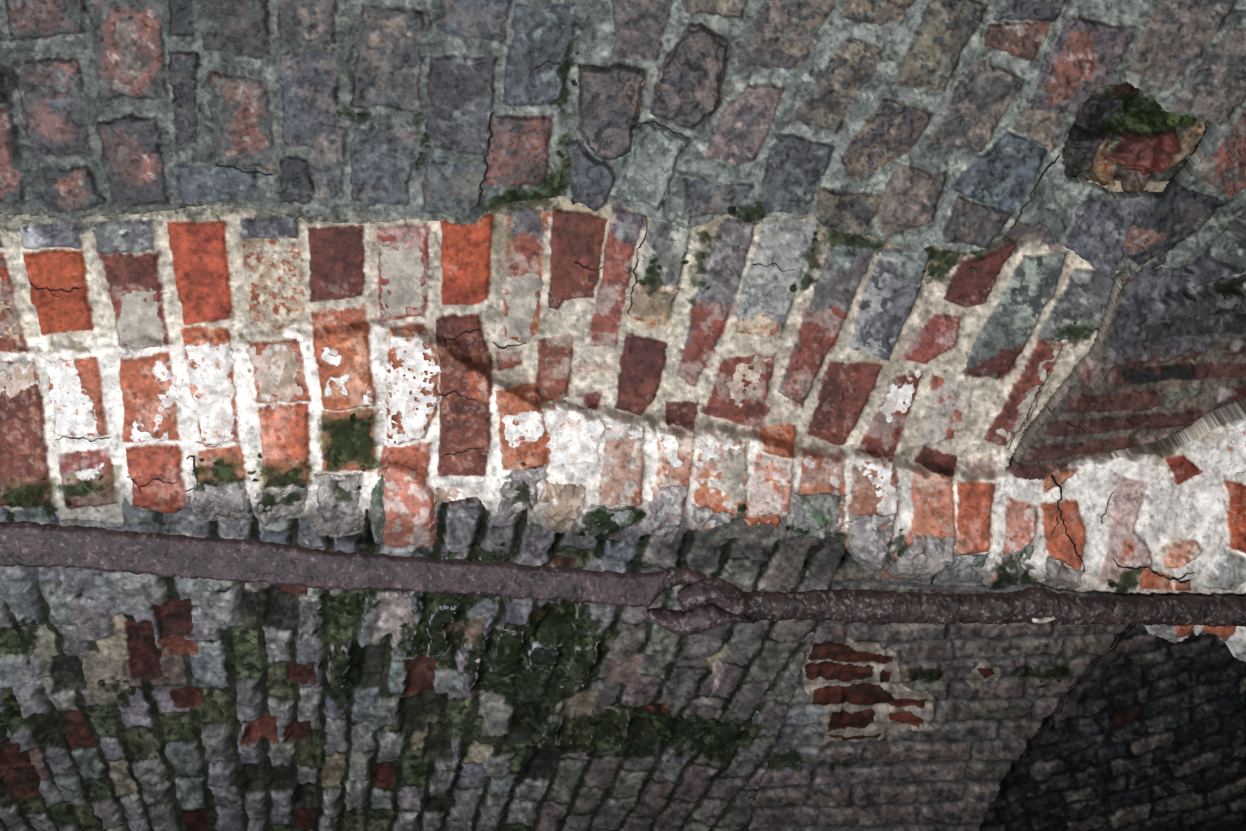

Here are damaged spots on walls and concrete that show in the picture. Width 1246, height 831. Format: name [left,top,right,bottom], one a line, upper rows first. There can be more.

spalling [1062,82,1210,192]
spalling [435,487,478,506]
peeling [489,395,1084,592]
peeling [996,349,1061,446]
peeling [1225,420,1246,475]
crack [1008,624,1136,777]